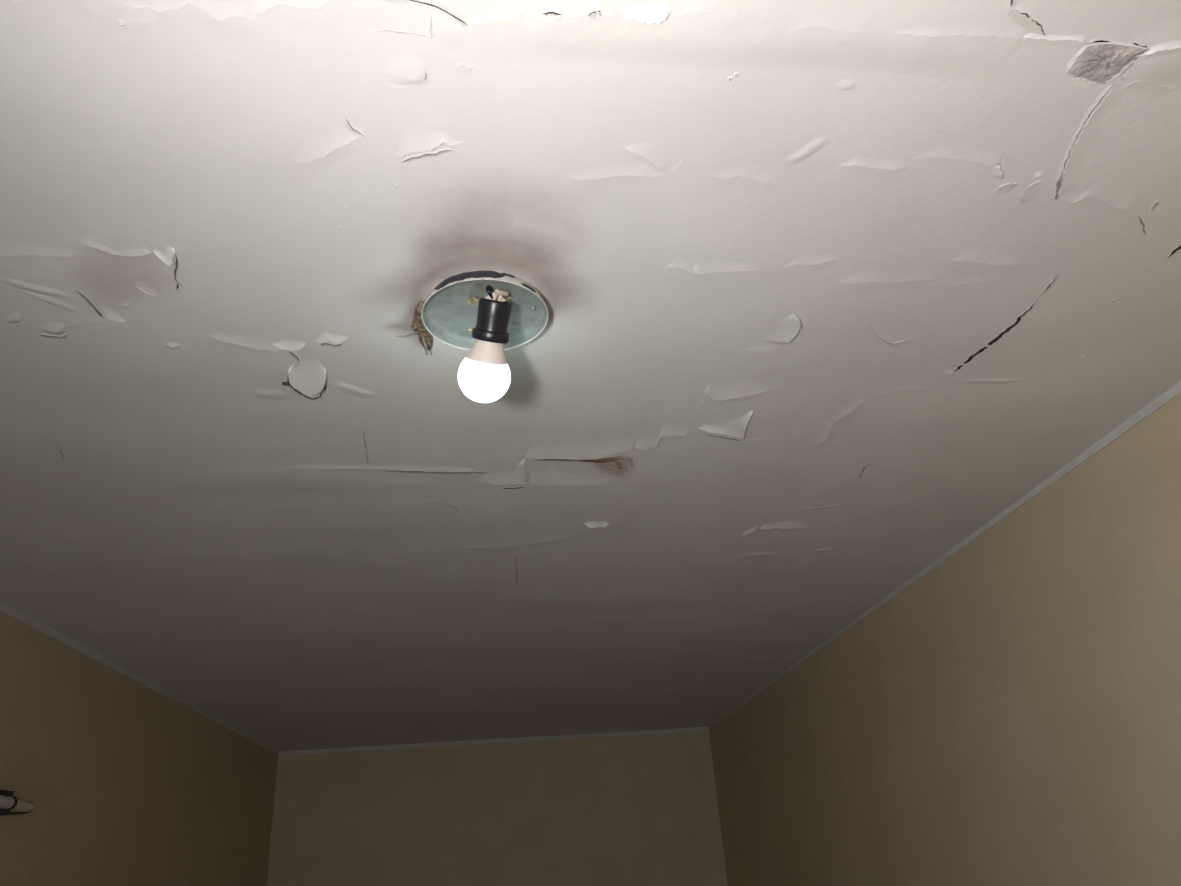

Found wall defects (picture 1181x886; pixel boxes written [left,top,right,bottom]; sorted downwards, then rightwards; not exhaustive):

crack [1002,0,1055,36]
flaking render [1021,33,1181,104]
peeling [391,127,464,163]
crack [1051,76,1133,200]
peeling [76,235,183,296]
crack [1163,243,1181,261]
crack [945,273,1059,376]
peeling [207,330,378,401]
peeling [268,410,780,489]